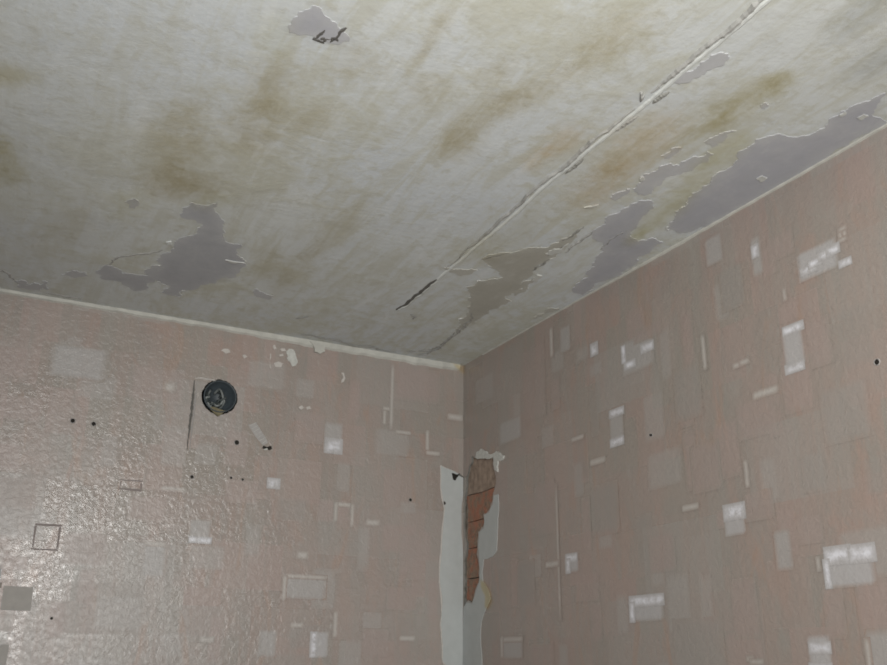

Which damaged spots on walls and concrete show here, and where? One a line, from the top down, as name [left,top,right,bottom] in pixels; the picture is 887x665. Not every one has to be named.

peeling [288,5,350,45]
peeling [675,52,730,85]
crack [396,0,763,319]
peeling [666,93,887,233]
peeling [61,202,247,297]
peeling [411,130,736,351]
crack [296,313,474,355]
flaking render [440,449,505,665]